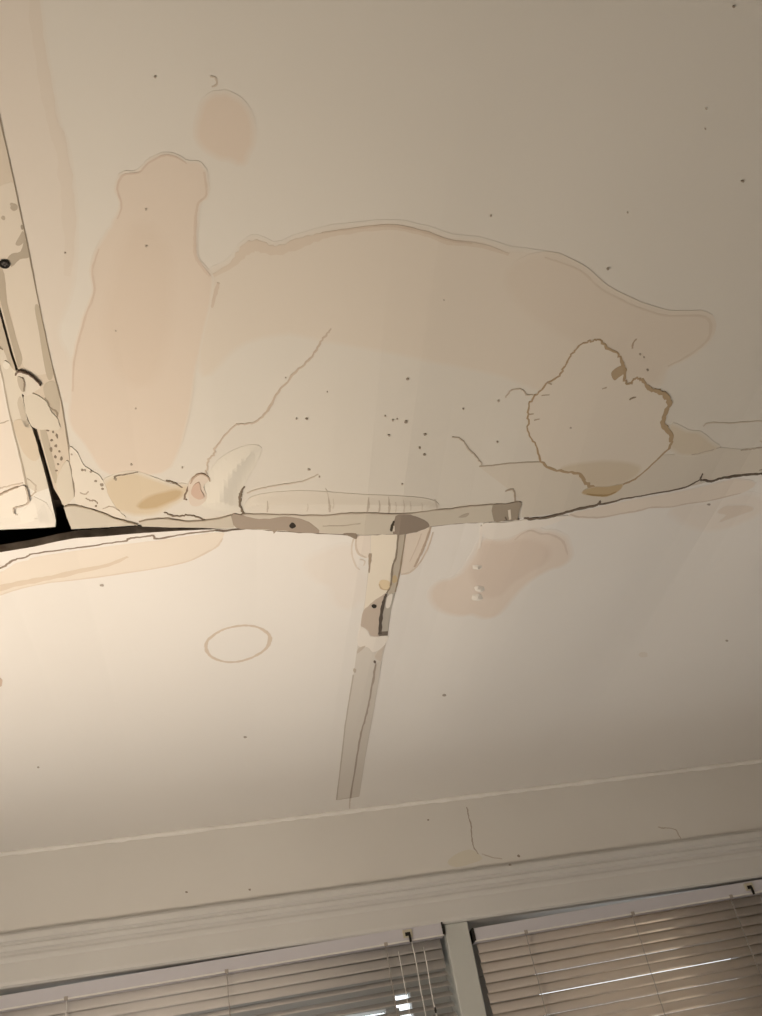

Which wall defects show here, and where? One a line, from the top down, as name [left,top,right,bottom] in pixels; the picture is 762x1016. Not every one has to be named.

damp [0,0,762,533]
peeling [0,225,126,519]
crack [0,329,347,569]
crack [452,436,482,465]
crack [431,469,762,527]
damp [0,532,224,596]
damp [427,525,575,620]
damp [204,624,272,663]
peeling [361,593,386,661]